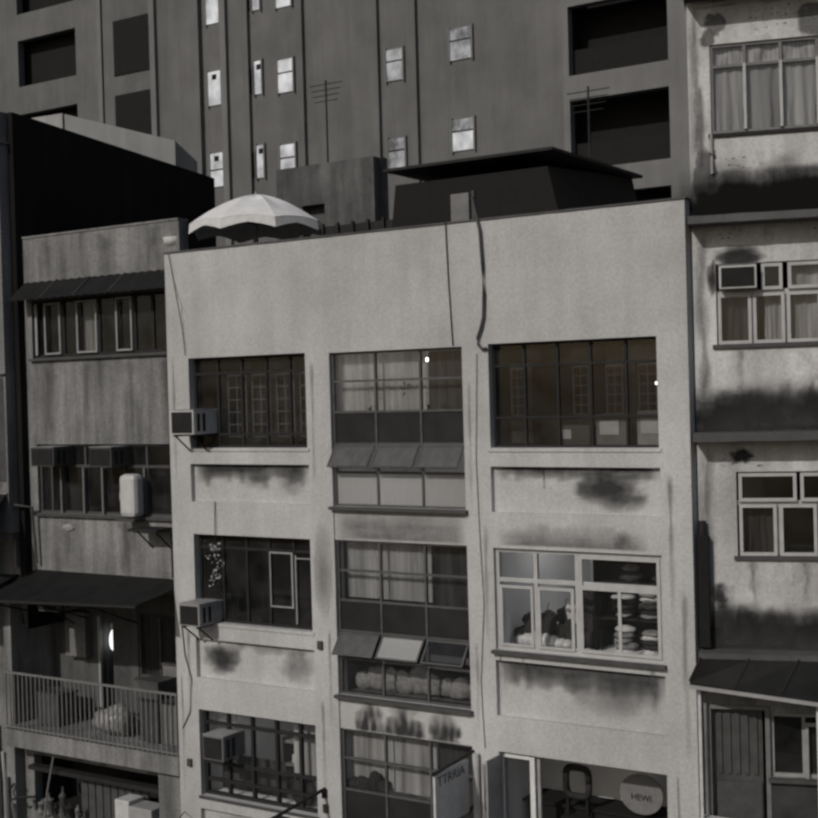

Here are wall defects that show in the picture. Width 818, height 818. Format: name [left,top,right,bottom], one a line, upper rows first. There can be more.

water stain [686,167,818,216]
water stain [694,391,818,432]
water stain [202,464,303,481]
water stain [503,467,652,504]
water stain [700,584,818,651]
water stain [209,647,236,670]
water stain [509,661,657,694]
water stain [356,706,460,742]